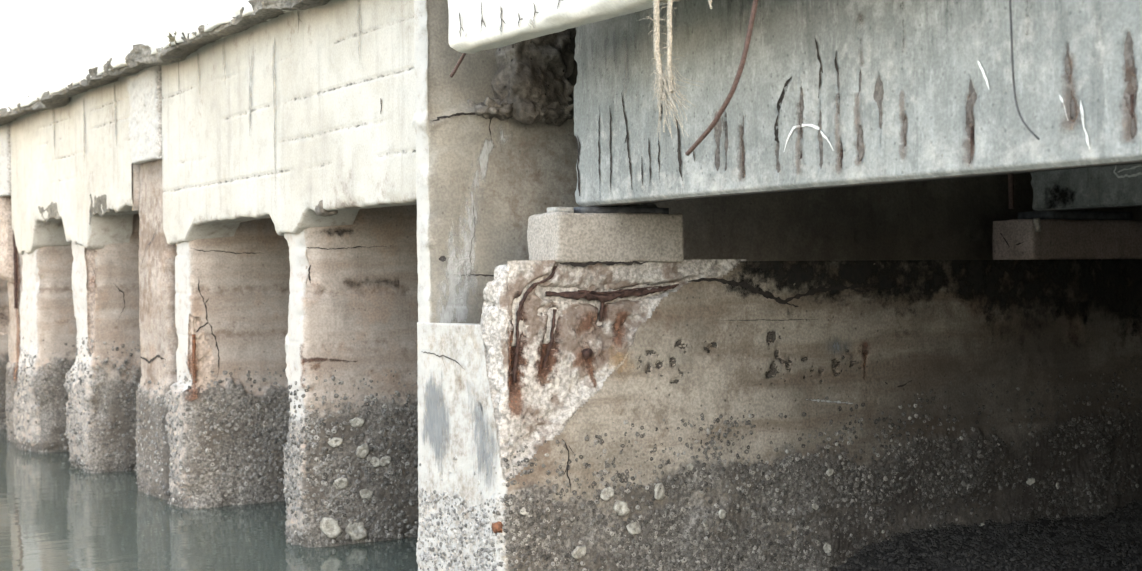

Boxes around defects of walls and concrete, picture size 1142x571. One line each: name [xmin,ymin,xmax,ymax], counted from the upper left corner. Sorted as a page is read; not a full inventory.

rust [185,354,199,402]
crack [192,248,264,376]
crack [306,246,387,284]
rust [507,291,560,416]
rust [574,304,628,387]
spalling [479,259,746,481]
damp [729,259,1142,347]